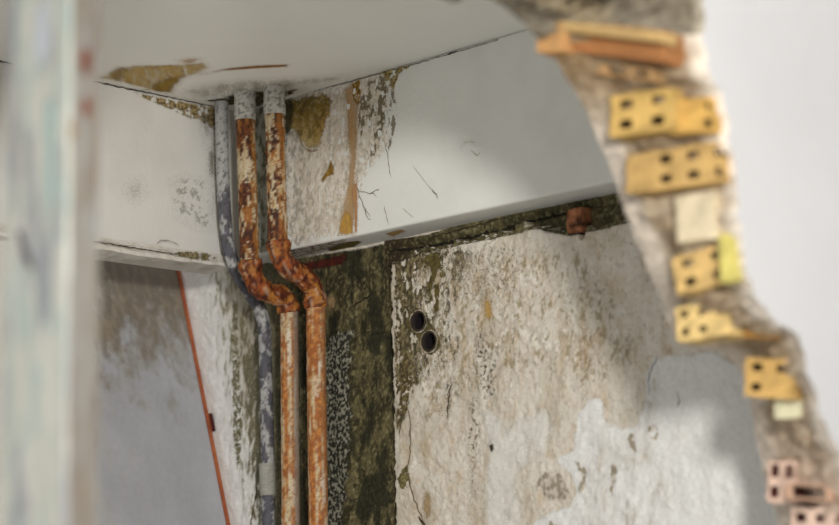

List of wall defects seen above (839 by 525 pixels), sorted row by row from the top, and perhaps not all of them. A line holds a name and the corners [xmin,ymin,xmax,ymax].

leakage [99,57,336,253]
peeling [284,70,394,258]
rust [338,79,361,236]
rust [302,254,346,270]
leakage [327,241,361,252]
spalling [407,0,839,525]
peeling [326,330,355,525]
spalling [398,467,410,489]
leakage [465,404,494,507]